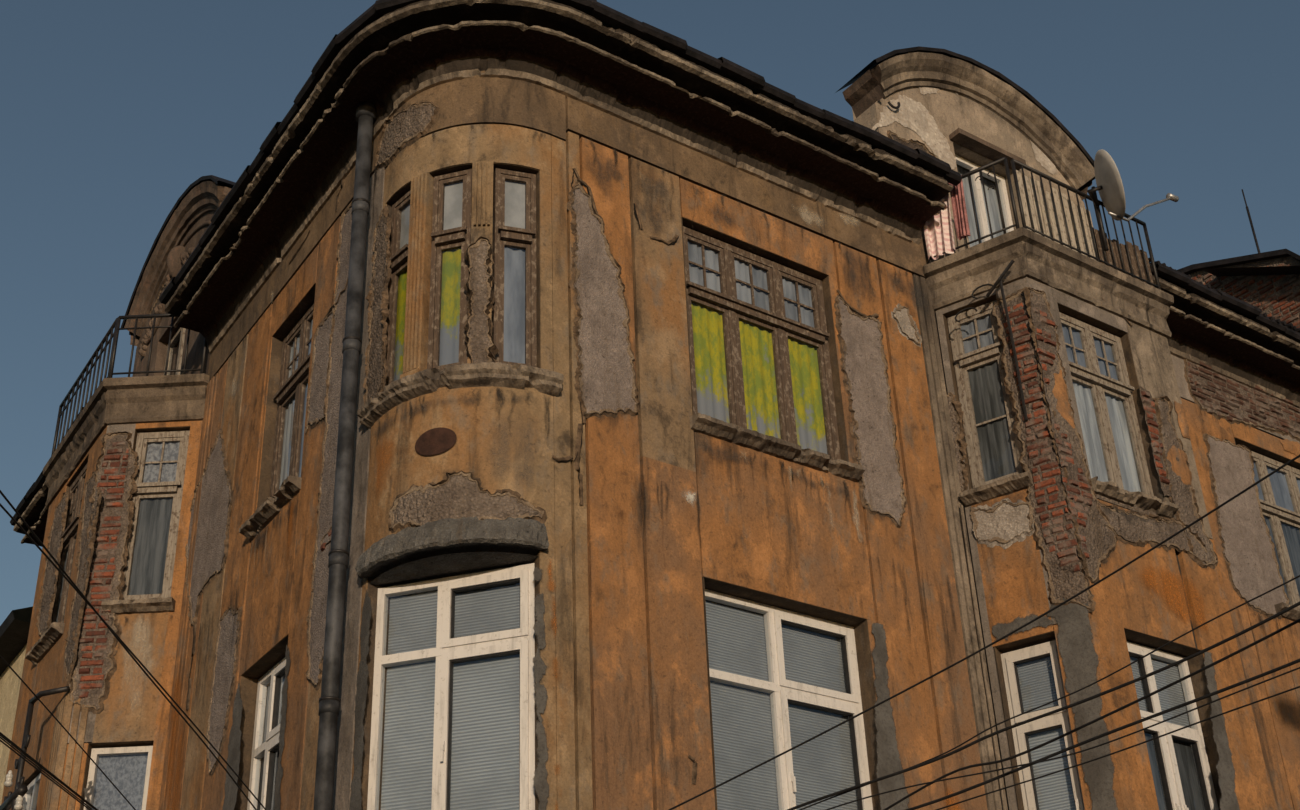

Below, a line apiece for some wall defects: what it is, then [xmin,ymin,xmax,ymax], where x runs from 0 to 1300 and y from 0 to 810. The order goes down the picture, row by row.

flaking render [375,101,440,170]
flaking render [362,206,392,405]
flaking render [567,178,640,419]
flaking render [1191,262,1300,328]
flaking render [36,431,139,714]
flaking render [185,429,233,626]
flaking render [305,205,352,691]
flaking render [388,470,547,533]
flaking render [834,295,922,528]
flaking render [947,392,969,492]
flaking render [970,287,1300,619]
flaking render [206,606,243,776]